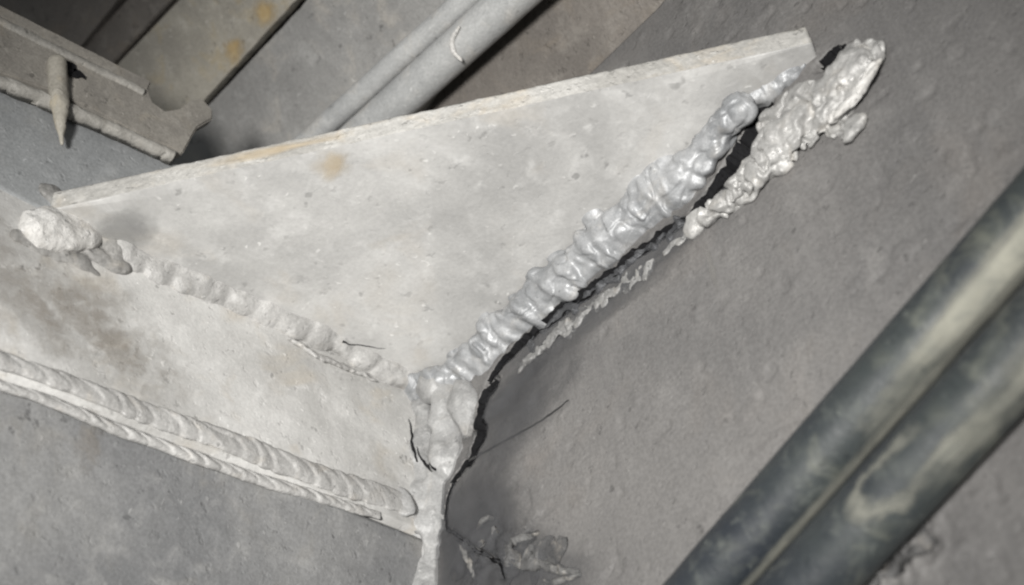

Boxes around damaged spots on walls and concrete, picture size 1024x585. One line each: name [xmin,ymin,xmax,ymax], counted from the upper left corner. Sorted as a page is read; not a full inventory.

crack [408,101,774,579]